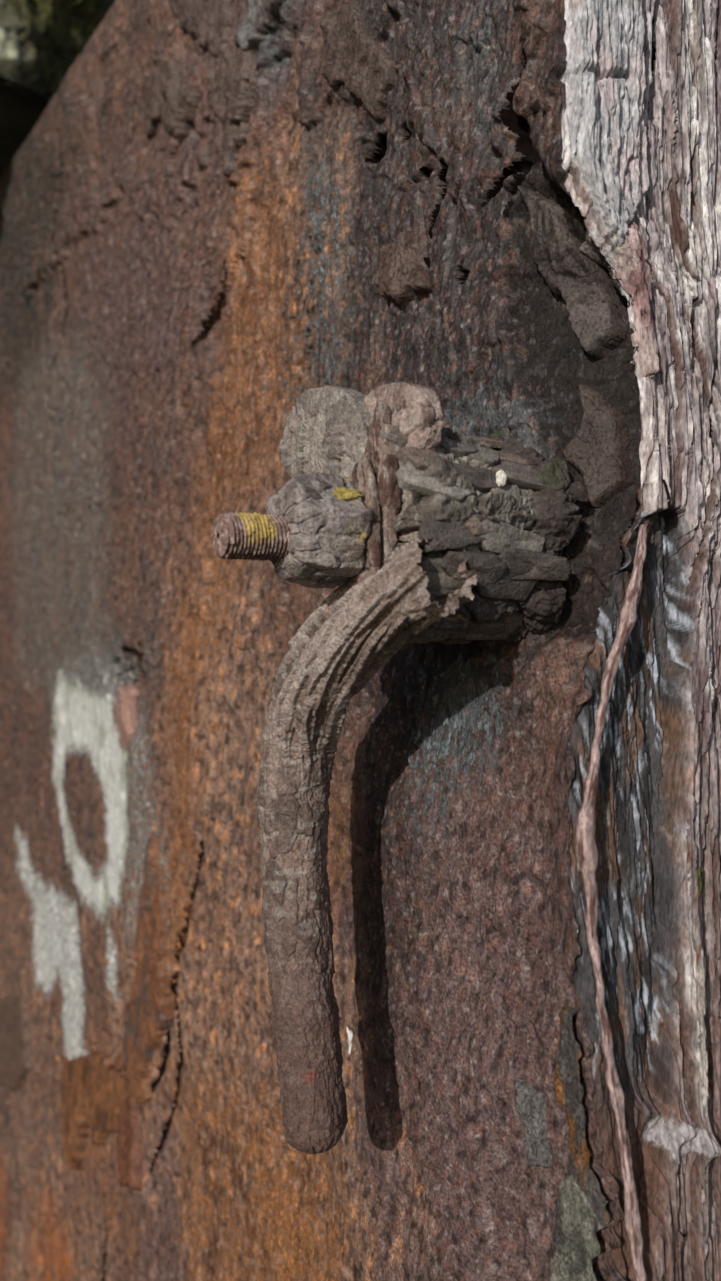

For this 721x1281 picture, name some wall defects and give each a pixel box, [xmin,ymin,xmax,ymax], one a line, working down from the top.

crack [649,13,657,76]
crack [707,409,715,448]
rust [60,159,311,1191]
rust [0,994,32,1092]
crack [148,840,204,1172]